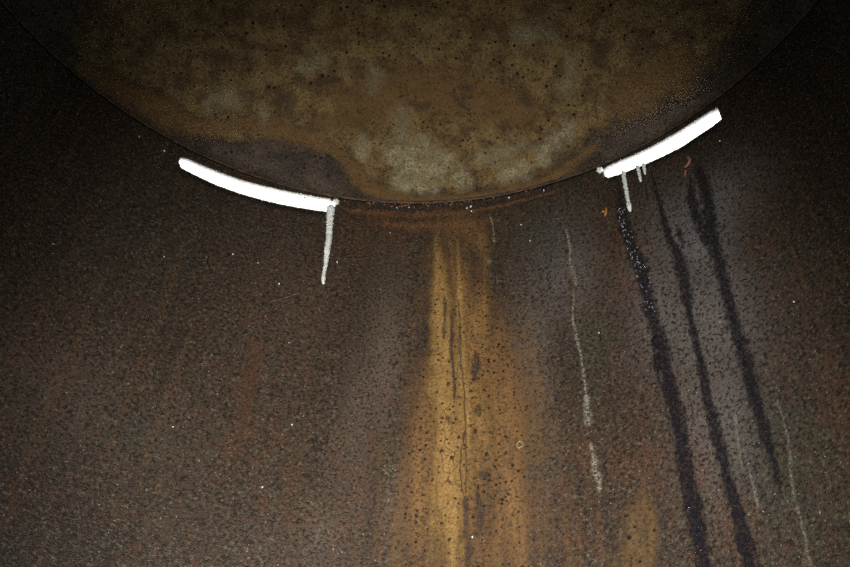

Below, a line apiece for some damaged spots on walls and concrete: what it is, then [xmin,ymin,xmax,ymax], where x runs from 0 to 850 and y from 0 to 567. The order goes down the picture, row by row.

corrosion [74,0,749,255]
crack [438,368,484,499]
corrosion [405,240,527,567]
water stain [616,183,710,567]
water stain [646,169,759,567]
water stain [686,157,781,490]